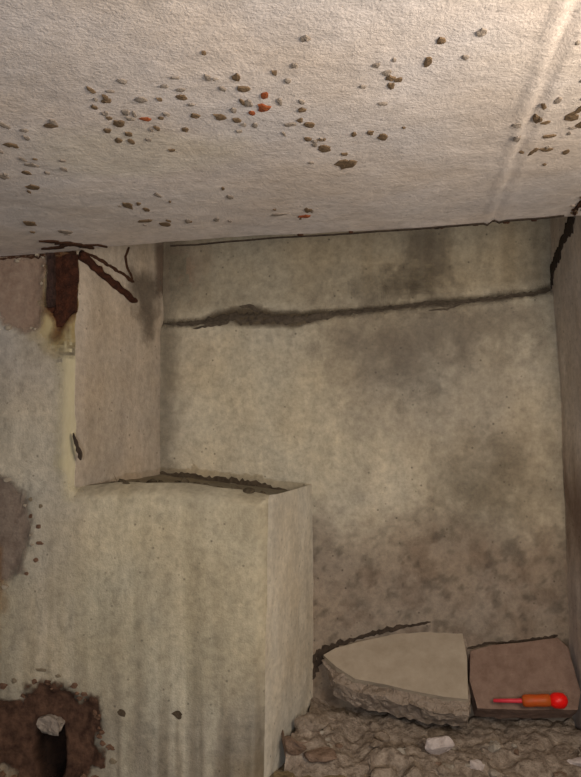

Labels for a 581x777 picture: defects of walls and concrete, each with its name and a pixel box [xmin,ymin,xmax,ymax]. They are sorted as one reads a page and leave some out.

peeling [86,76,201,145]
peeling [213,73,282,133]
peeling [282,99,331,153]
peeling [372,58,402,90]
peeling [532,97,562,125]
peeling [564,106,581,135]
crack [162,196,581,329]
rust [41,251,138,345]
crack [160,471,286,490]
spalling [0,477,44,590]
crack [312,621,431,680]
spalling [0,668,118,777]